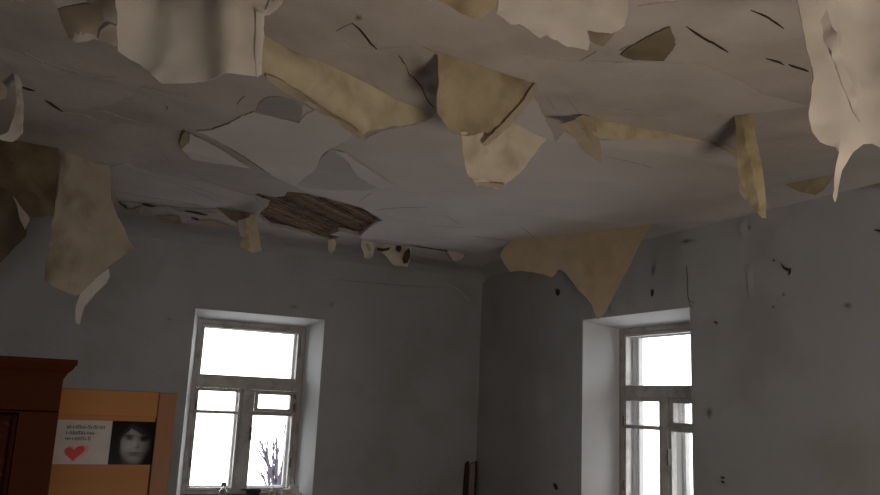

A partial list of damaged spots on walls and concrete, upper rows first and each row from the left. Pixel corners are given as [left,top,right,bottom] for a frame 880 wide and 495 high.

crack [751,10,784,29]
crack [686,26,728,52]
crack [335,23,434,107]
crack [766,58,809,72]
crack [22,87,271,175]
peeling [256,98,754,266]
crack [118,202,207,221]